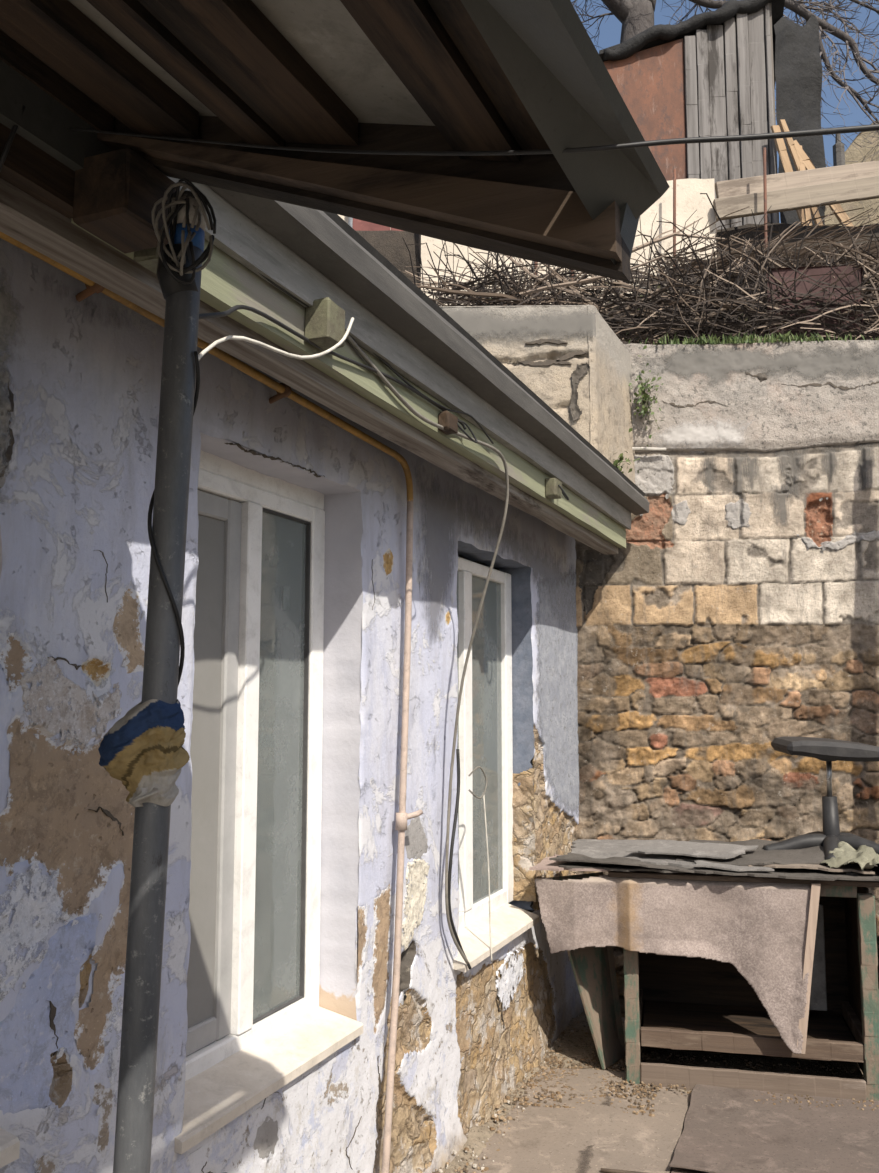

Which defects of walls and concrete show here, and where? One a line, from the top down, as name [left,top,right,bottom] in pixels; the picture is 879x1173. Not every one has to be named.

crack [225,443,325,477]
flaking render [626,493,674,549]
spalling [804,497,833,550]
flaking render [0,586,145,1162]
flaking render [456,941,556,1137]